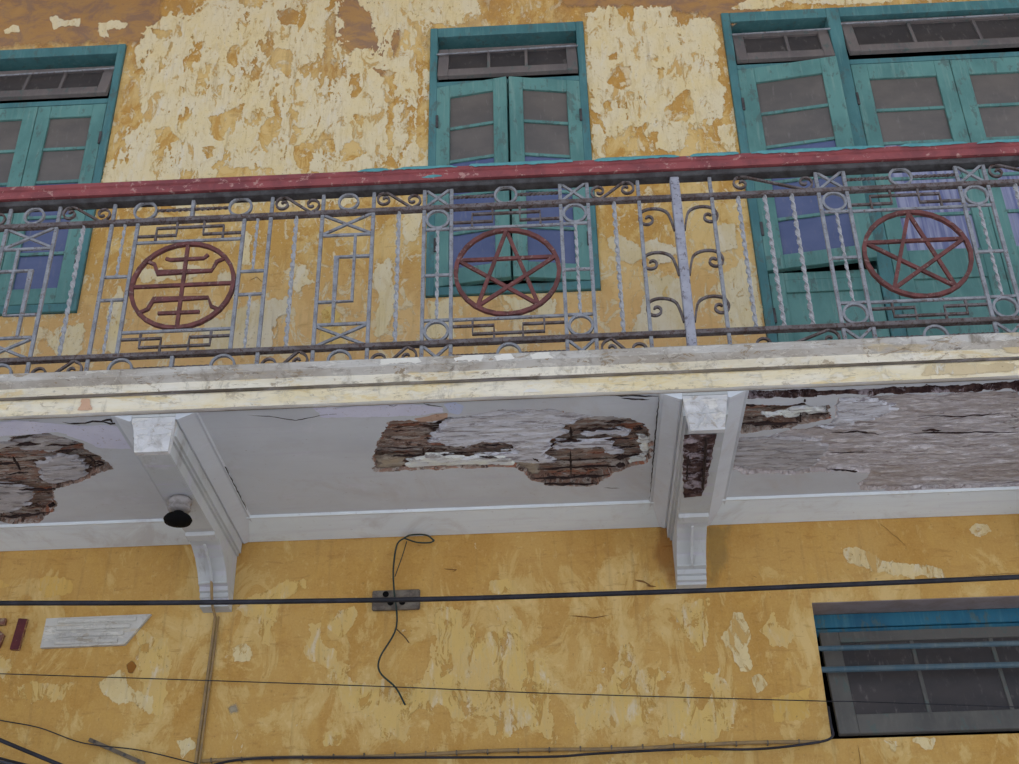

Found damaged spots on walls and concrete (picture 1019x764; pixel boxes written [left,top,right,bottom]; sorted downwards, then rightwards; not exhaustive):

peeling [98,0,573,183]
peeling [584,5,739,161]
peeling [171,197,364,213]
spalling [0,420,131,524]
spalling [313,402,654,487]
spalling [682,434,717,498]
spalling [733,347,1019,491]
peeling [489,578,519,595]
peeling [303,602,558,747]
peeling [574,635,737,743]
peeling [721,612,794,693]
peeling [912,737,936,750]